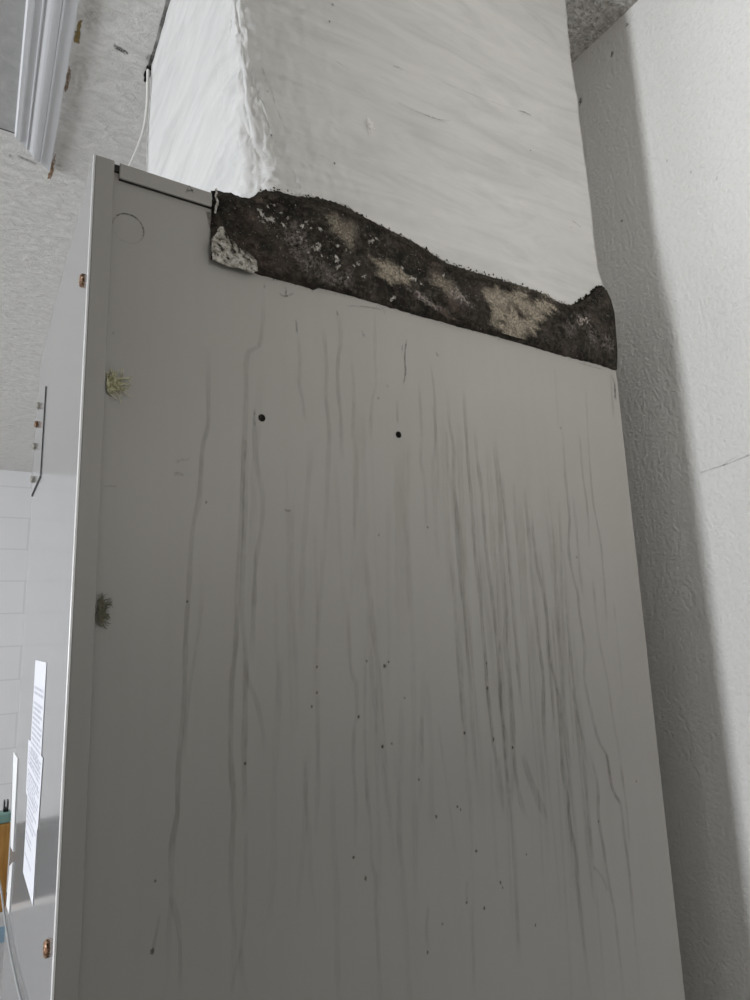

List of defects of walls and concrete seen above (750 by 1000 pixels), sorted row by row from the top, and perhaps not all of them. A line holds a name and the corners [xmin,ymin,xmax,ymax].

leakage [210,187,617,370]